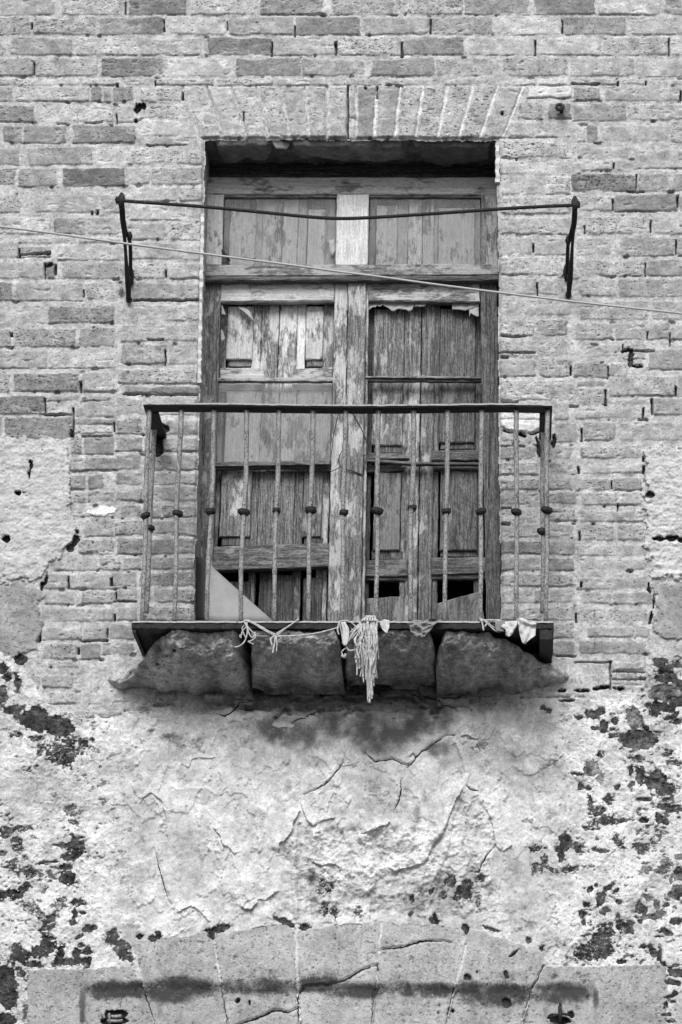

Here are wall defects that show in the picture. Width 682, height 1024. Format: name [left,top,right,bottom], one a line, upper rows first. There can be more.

spalling [66,529,80,552]
spalling [0,653,95,770]
water stain [260,709,447,754]
crack [368,693,463,812]
spalling [528,657,682,875]
spalling [0,804,163,1024]
crack [221,940,452,1024]
spalling [573,854,682,1023]